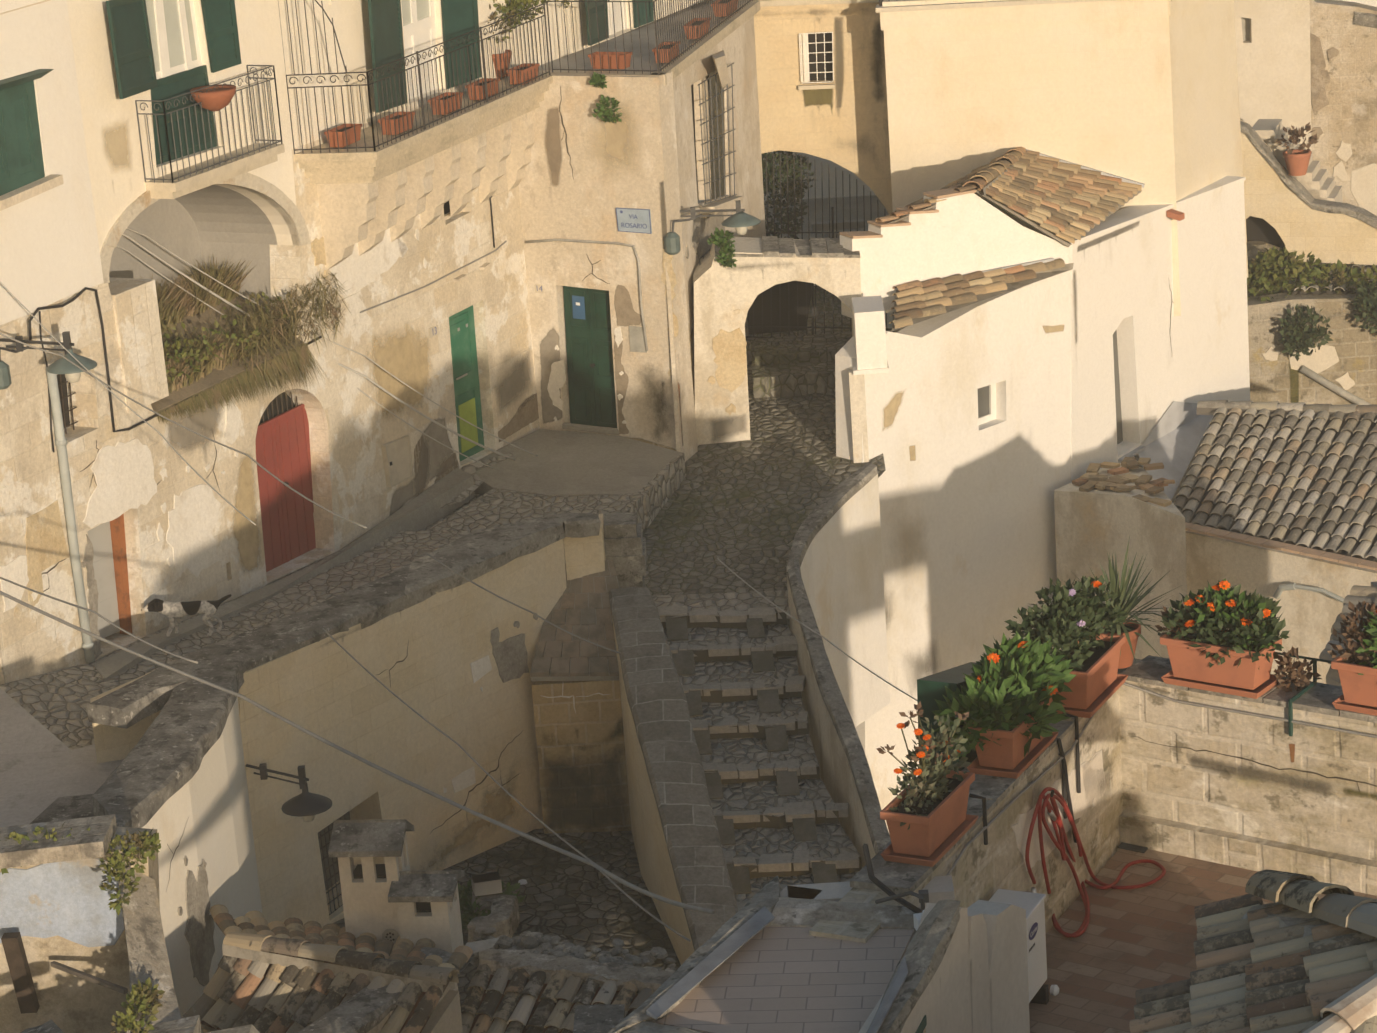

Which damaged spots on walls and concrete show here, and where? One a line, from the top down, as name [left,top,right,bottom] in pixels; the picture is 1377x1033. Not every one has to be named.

crack [559,87,574,179]
flaking render [311,228,420,295]
crack [582,255,609,284]
flaking render [223,401,241,458]
flaking render [81,438,225,659]
crack [430,733,521,834]
crack [1132,736,1377,795]